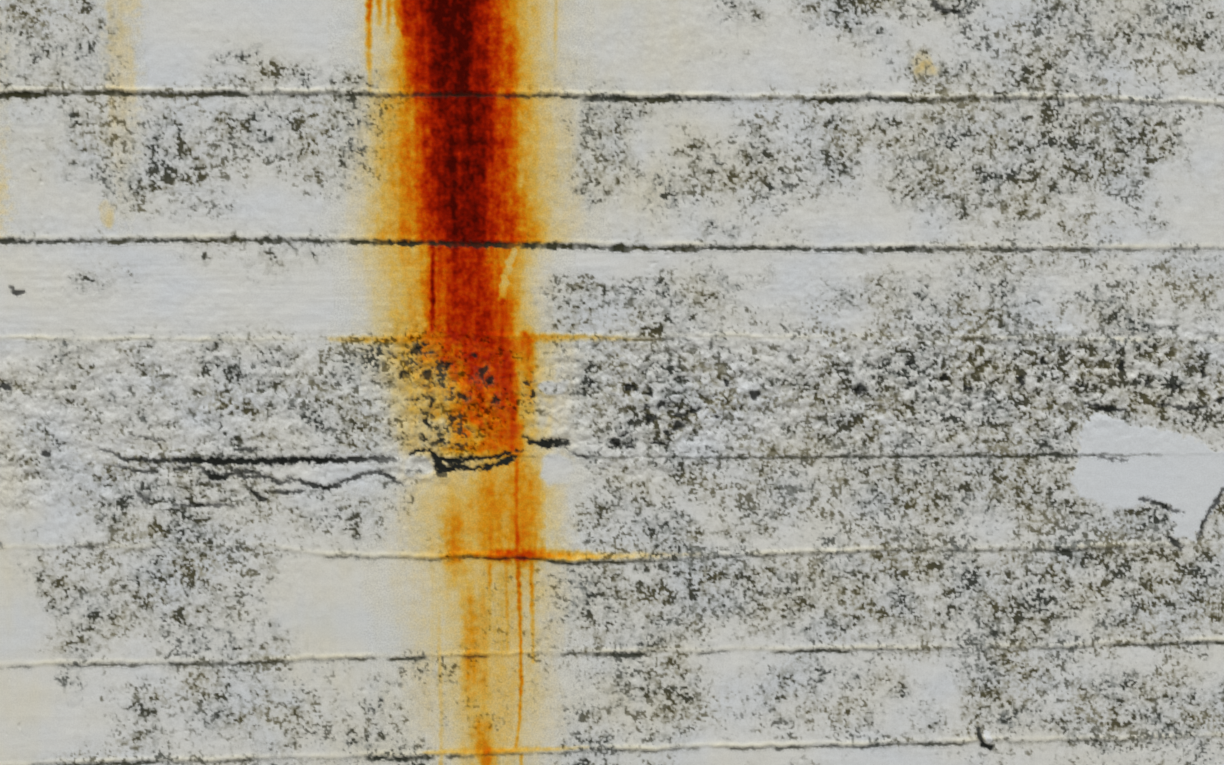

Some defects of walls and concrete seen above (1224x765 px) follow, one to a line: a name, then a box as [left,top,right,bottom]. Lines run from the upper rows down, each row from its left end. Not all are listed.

damp [0,0,398,322]
damp [570,0,793,254]
damp [788,0,1224,238]
damp [0,332,431,765]
rust [309,0,644,765]
crack [94,432,1163,510]
damp [545,245,1224,765]
spalling [811,325,963,399]
spalling [937,372,980,411]
spalling [993,328,1144,411]
spalling [1116,325,1224,405]
crack [1138,486,1224,553]